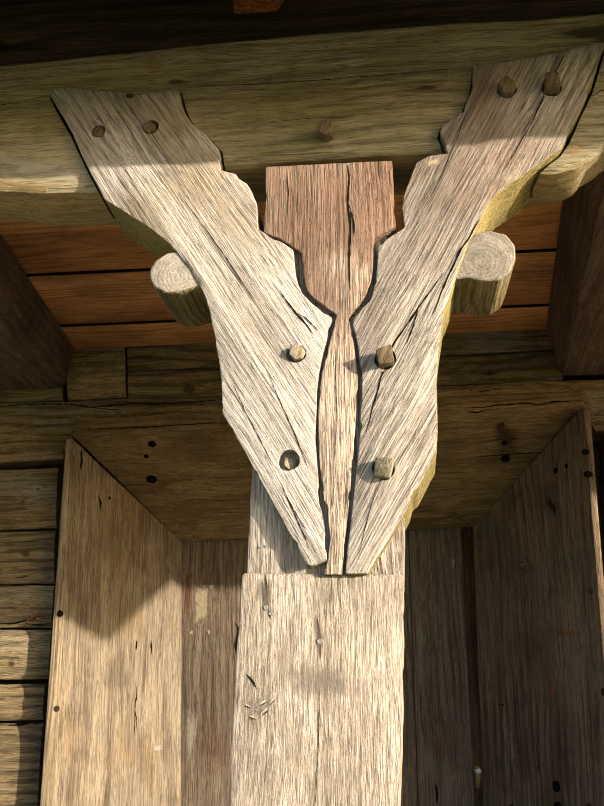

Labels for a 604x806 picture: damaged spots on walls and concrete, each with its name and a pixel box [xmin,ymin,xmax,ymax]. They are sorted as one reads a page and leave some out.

crack [347,165,355,289]
crack [280,291,317,334]